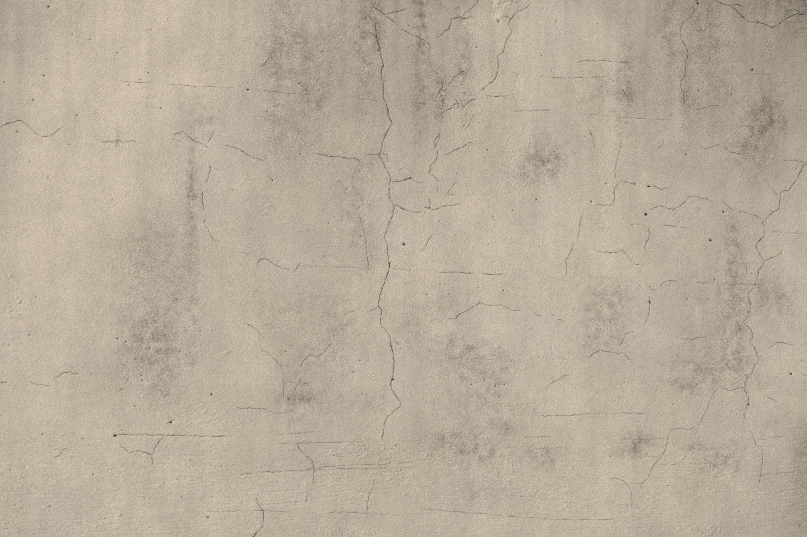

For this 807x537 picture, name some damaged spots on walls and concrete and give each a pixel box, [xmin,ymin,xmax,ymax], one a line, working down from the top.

crack [716,0,804,28]
crack [316,0,528,439]
crack [612,160,803,501]